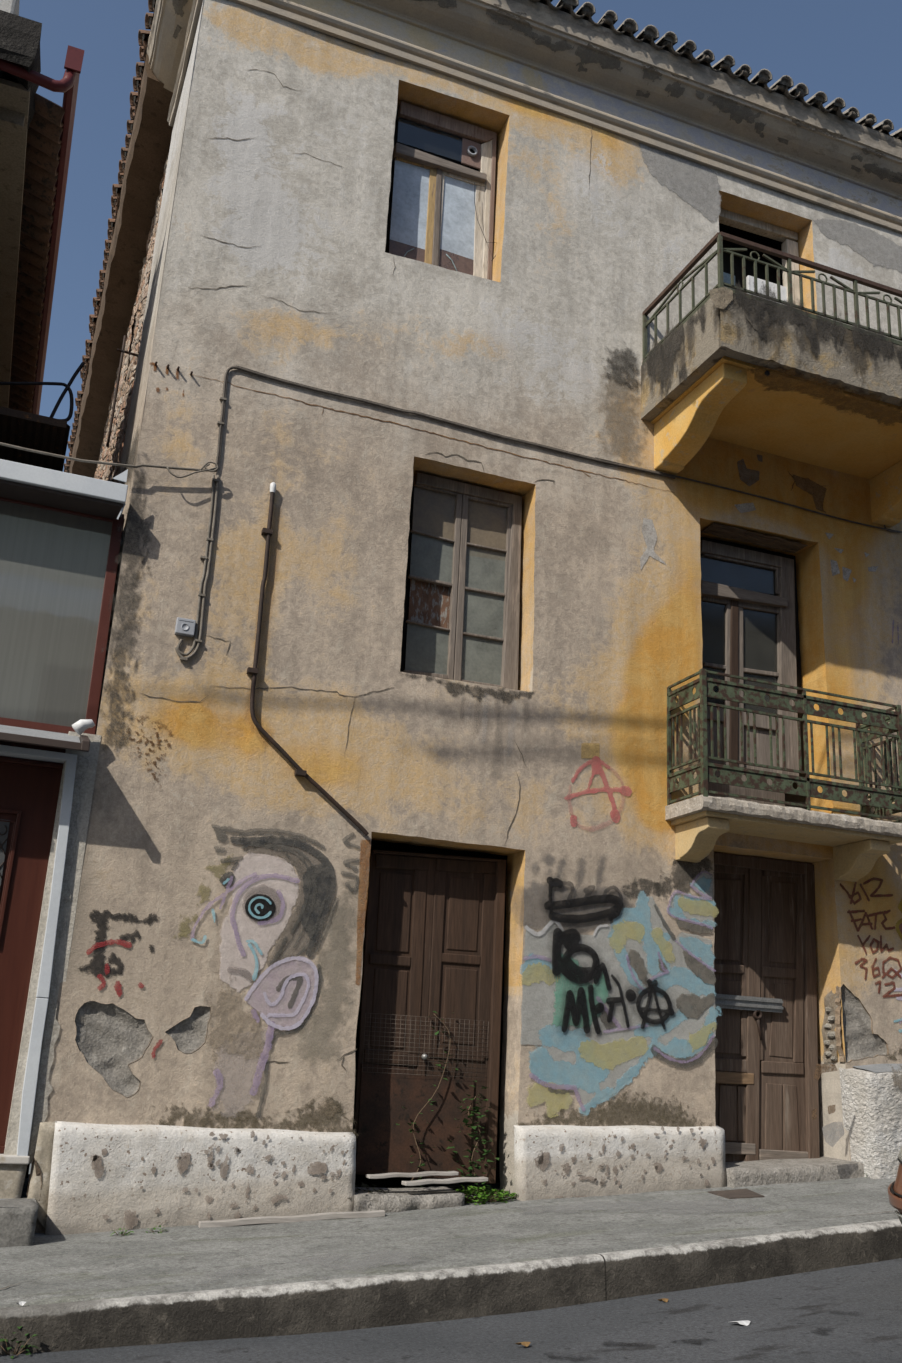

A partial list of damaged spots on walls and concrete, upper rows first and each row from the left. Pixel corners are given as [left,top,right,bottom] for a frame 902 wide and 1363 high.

peeling [486,4,623,72]
peeling [636,64,848,145]
peeling [851,147,902,184]
leakage [734,284,902,368]
leakage [606,305,704,462]
leakage [751,367,902,426]
leakage [100,430,151,748]
crack [141,635,394,758]
flaking render [75,1001,211,1097]
flaking render [814,984,889,1080]